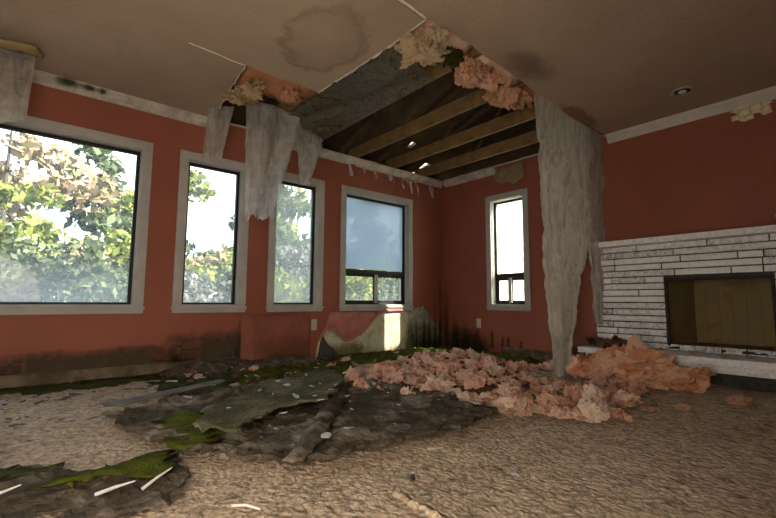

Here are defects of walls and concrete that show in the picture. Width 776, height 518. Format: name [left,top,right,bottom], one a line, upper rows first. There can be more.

flaking render [730,100,773,122]
water stain [0,334,240,376]
peeling [315,308,409,360]
mould [405,306,488,351]